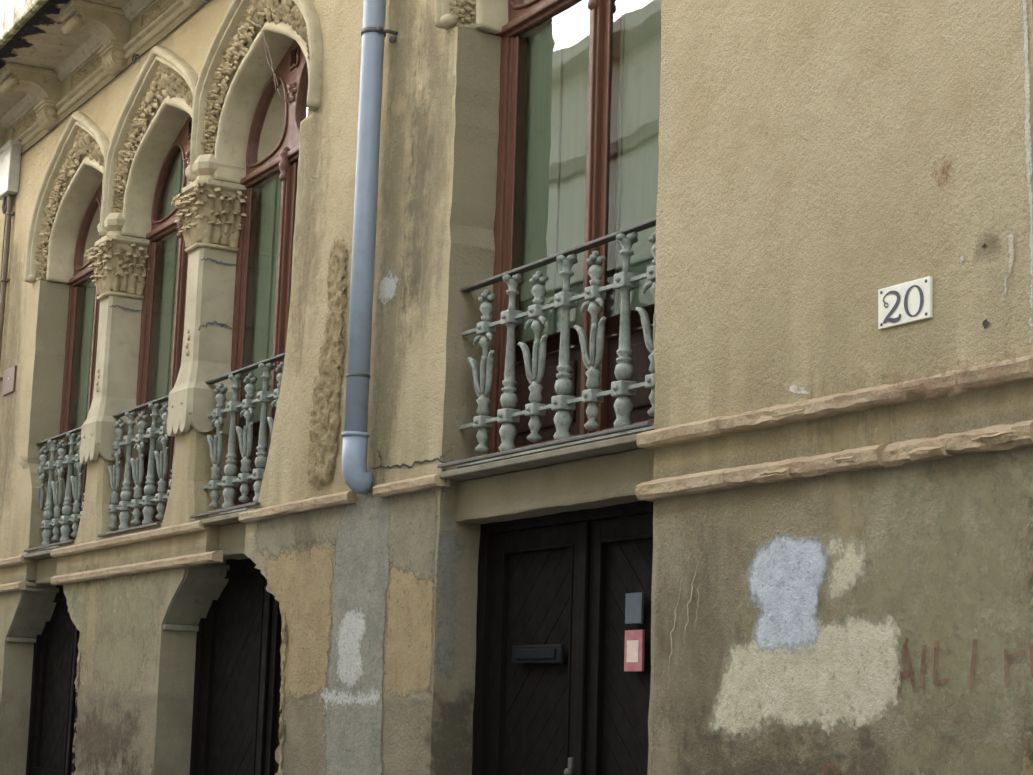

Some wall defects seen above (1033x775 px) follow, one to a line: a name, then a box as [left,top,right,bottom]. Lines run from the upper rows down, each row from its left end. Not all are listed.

spalling [278,613,288,775]